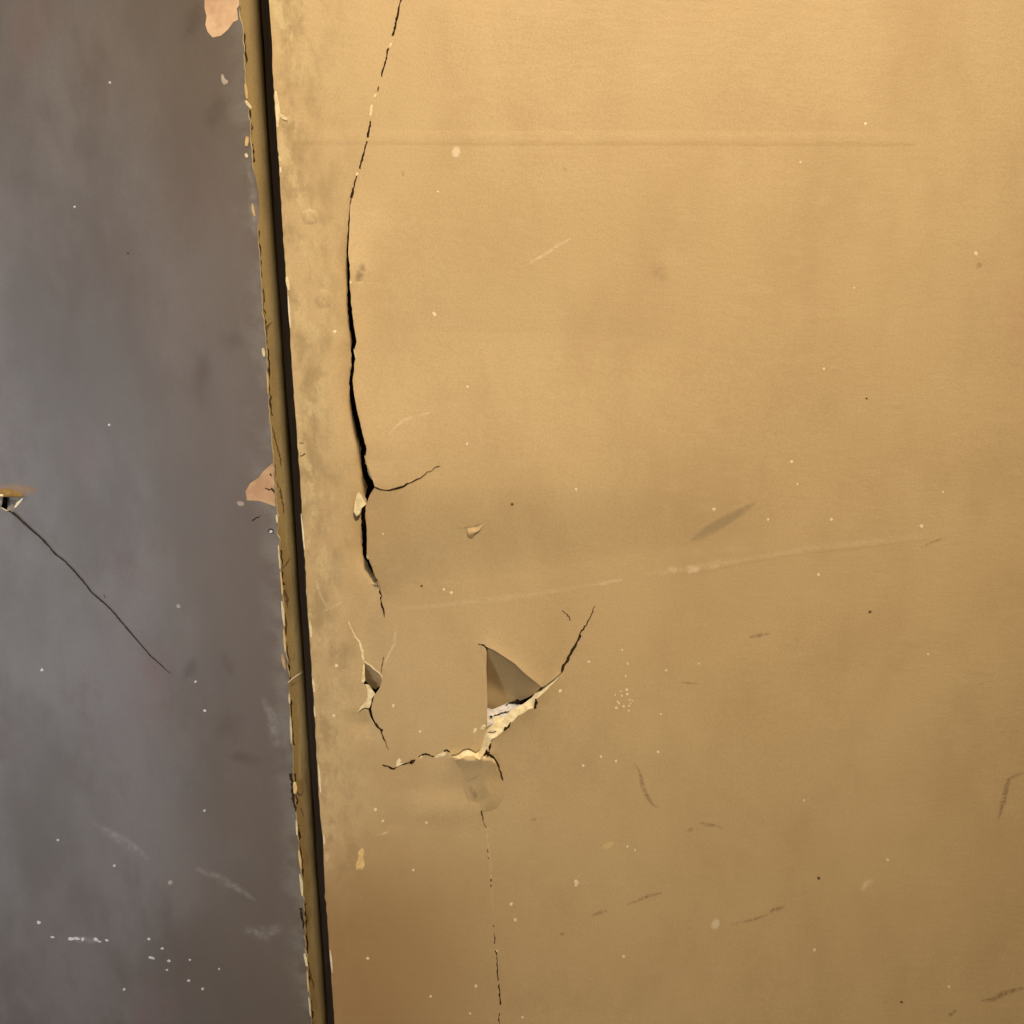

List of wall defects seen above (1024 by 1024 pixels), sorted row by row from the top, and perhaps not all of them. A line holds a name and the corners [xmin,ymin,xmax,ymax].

peeling [204,0,240,37]
crack [347,0,439,617]
peeling [237,463,278,533]
crack [8,510,171,674]
crack [480,810,501,1024]